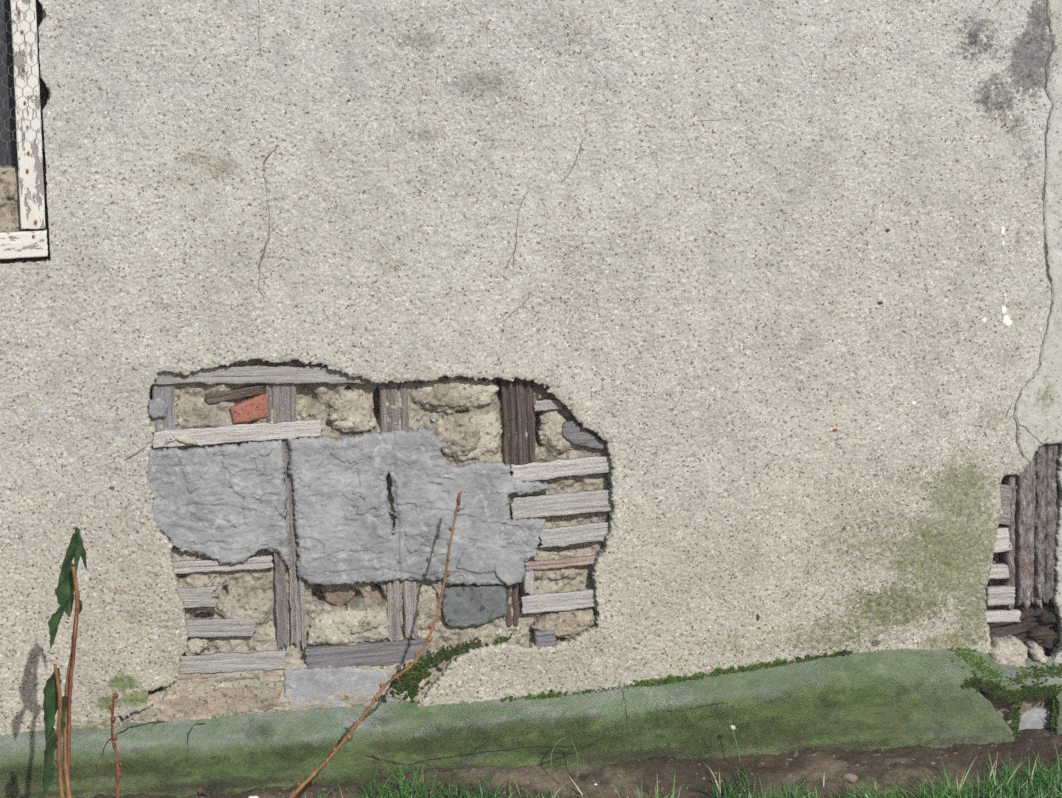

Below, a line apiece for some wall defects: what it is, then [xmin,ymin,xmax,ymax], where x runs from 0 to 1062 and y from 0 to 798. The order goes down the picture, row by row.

damp [961,1,1056,136]
crack [258,145,278,297]
crack [1006,0,1053,457]
spalling [121,359,613,723]
spalling [985,443,1060,668]